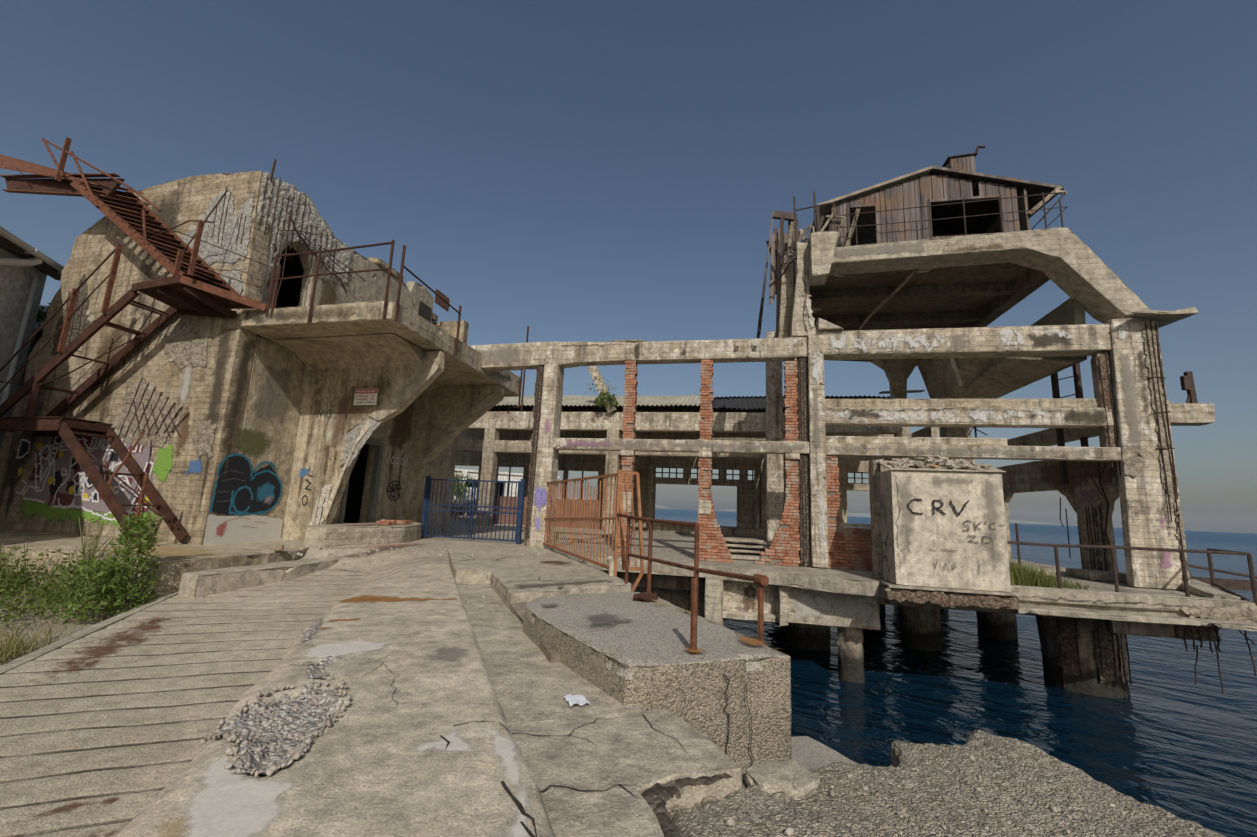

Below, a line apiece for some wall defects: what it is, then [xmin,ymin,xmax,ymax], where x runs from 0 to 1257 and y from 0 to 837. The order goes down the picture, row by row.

spalling [181,159,365,308]
corrosion [174,407,189,468]
spalling [1176,605,1257,694]
spalling [200,656,353,777]
crack [453,714,686,751]